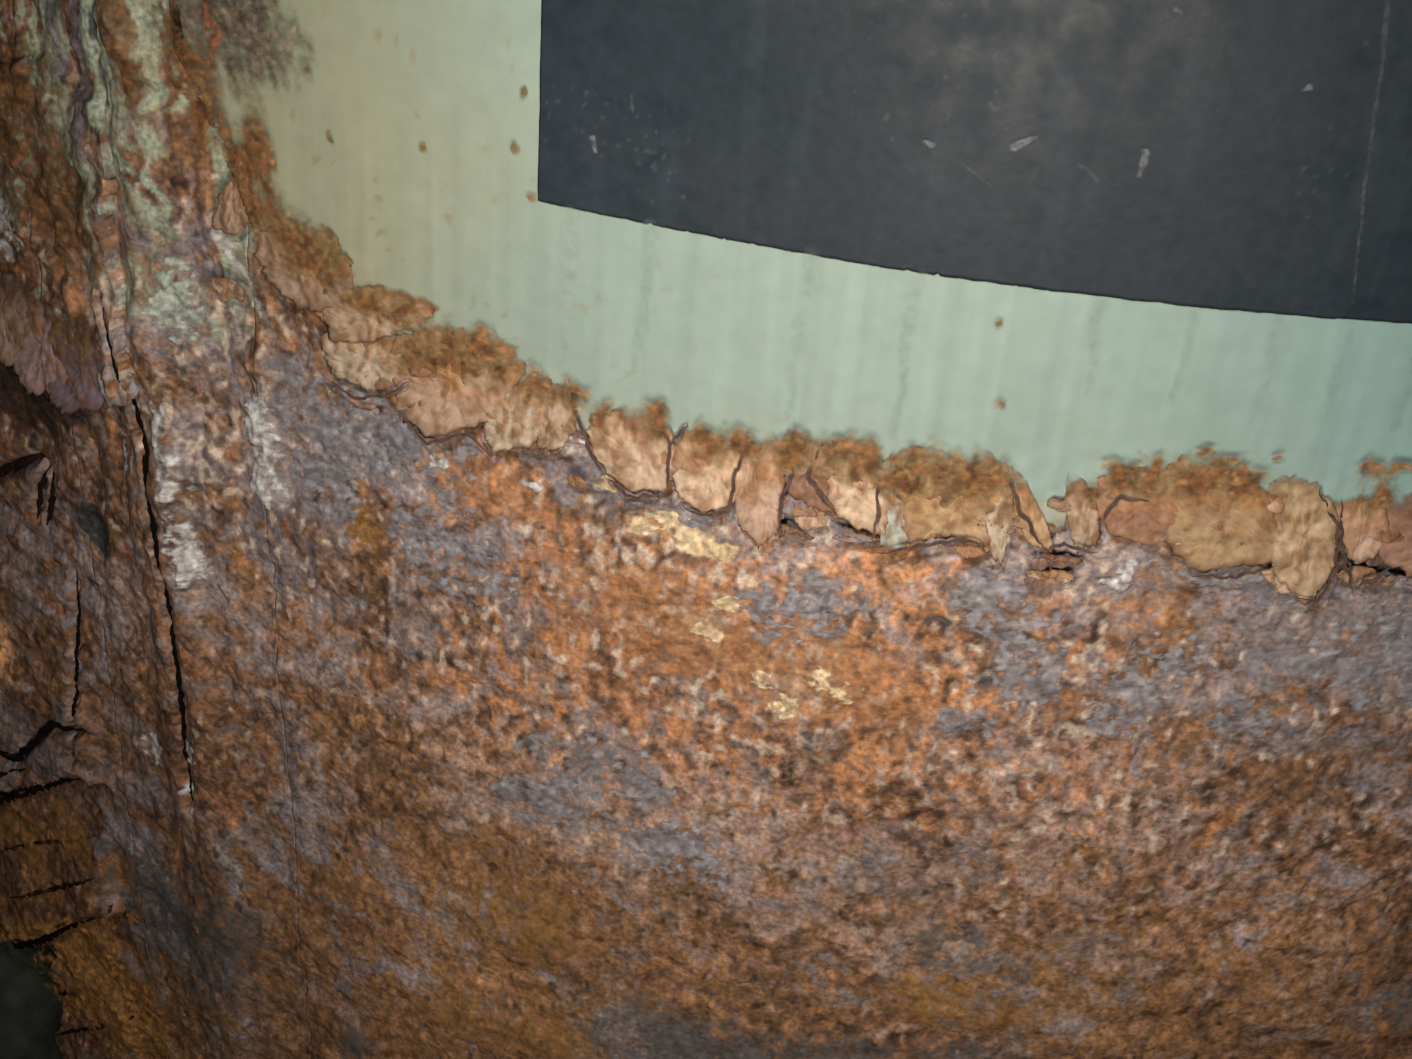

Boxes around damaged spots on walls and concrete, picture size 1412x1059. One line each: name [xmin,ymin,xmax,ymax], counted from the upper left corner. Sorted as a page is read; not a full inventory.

rust [0,0,143,274]
rust [152,0,505,391]
crack [100,296,193,805]
rust [524,364,610,434]
rust [641,401,670,440]
rust [553,552,924,723]
peeling [210,179,1412,605]
rust [693,422,1013,513]
rust [1116,582,1192,644]
rust [1082,446,1283,504]
rust [1359,460,1412,513]
rust [0,897,186,1059]